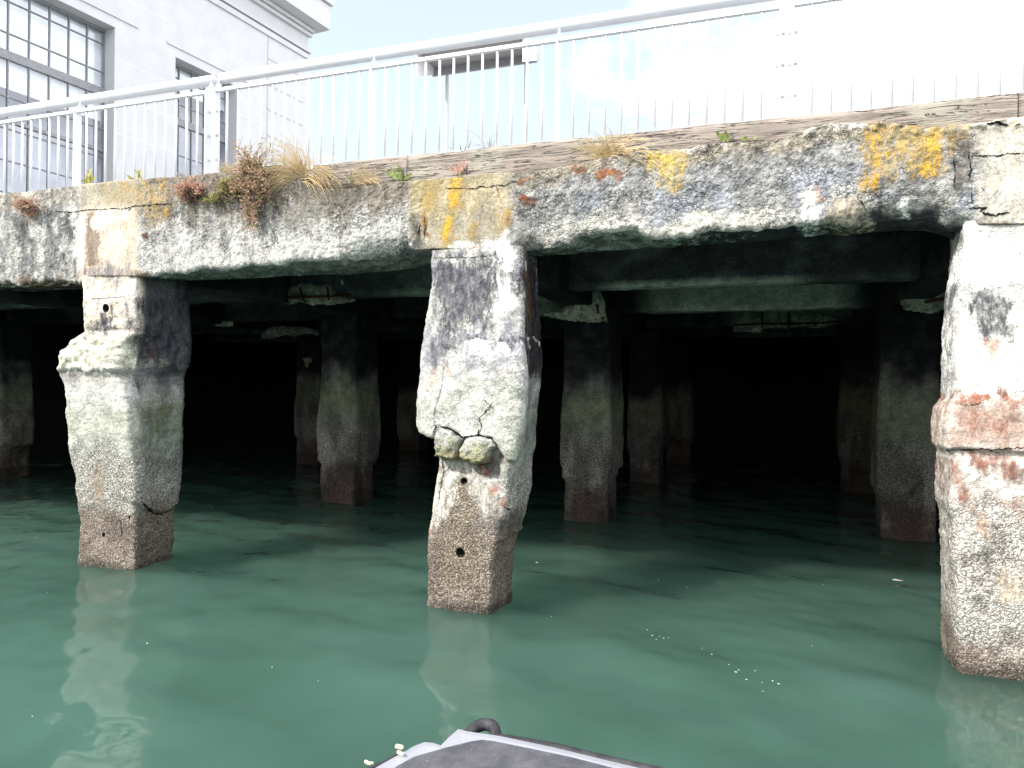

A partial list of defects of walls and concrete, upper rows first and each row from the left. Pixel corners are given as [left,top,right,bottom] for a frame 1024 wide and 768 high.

crack [953,153,1020,217]
damp [429,210,547,379]
spalling [544,291,607,323]
damp [941,232,1017,392]
crack [432,368,497,447]
rust [931,387,1024,530]
crack [141,501,177,515]